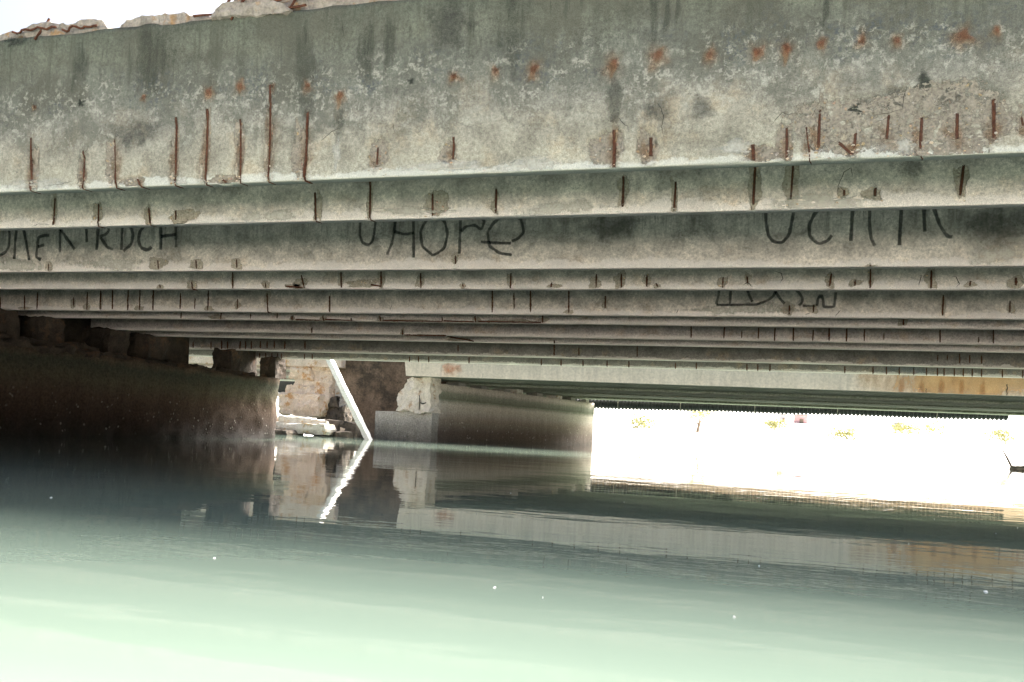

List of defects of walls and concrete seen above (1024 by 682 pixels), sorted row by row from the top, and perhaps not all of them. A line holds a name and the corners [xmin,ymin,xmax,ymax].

spalling [0,0,397,41]
spalling [744,76,1024,210]
rust [894,375,1024,395]